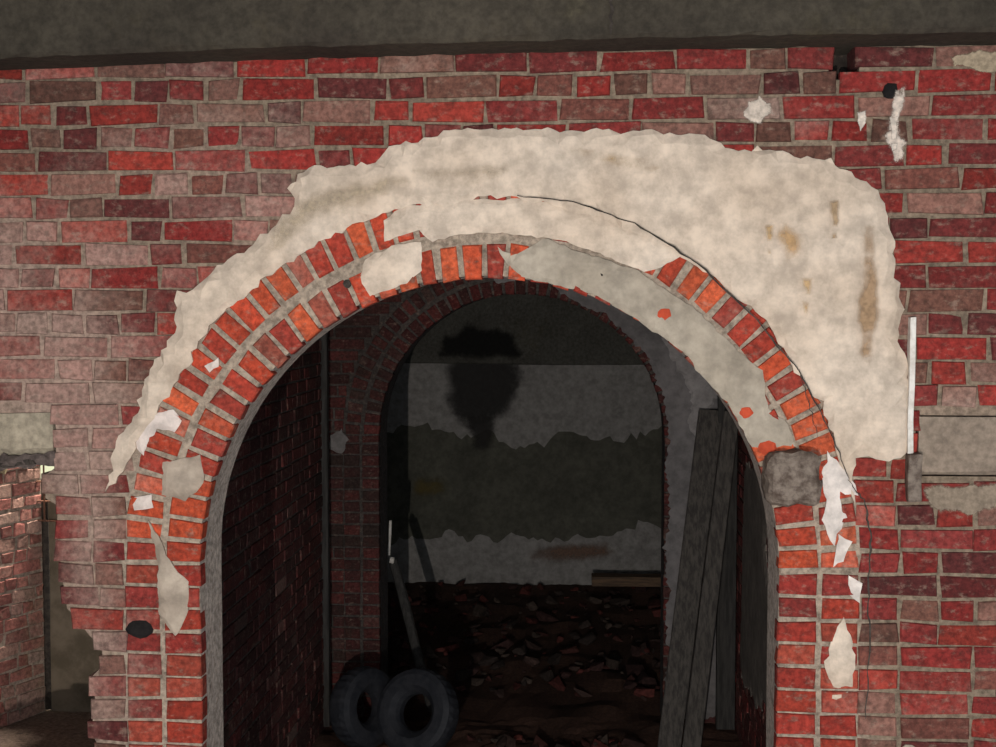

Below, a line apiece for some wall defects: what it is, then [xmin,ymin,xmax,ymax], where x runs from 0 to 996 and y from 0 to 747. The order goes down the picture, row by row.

damp [440,327,520,358]
flaking render [105,127,908,647]
spalling [0,450,56,474]
damp [387,417,662,545]
flaking render [685,468,717,719]
flaking render [735,462,768,711]
flaking render [824,617,855,700]